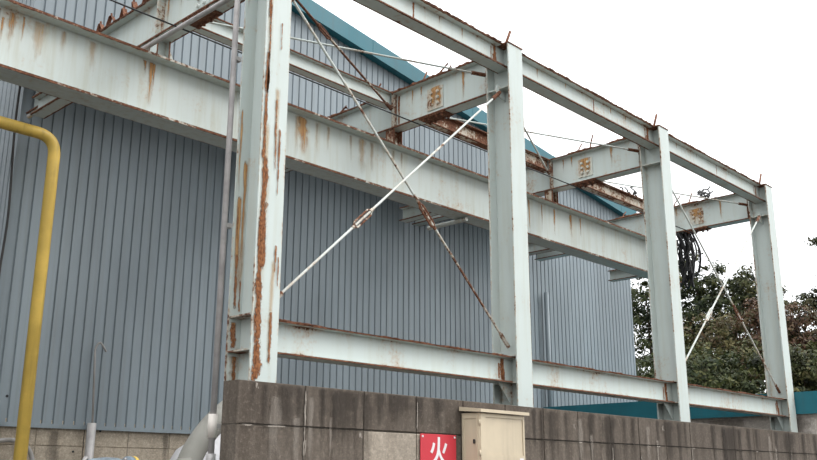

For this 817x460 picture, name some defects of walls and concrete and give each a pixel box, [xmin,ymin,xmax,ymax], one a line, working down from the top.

corrosion [144,60,156,91]
corrosion [233,111,248,311]
corrosion [251,0,508,381]
water stain [321,390,407,424]
water stain [605,417,616,460]